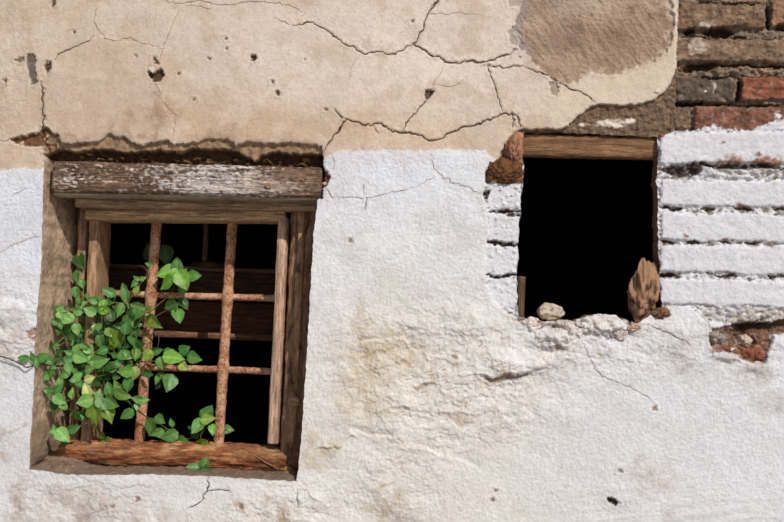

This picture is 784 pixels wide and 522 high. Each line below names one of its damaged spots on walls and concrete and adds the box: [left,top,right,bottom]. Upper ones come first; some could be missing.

crack [41,85,56,159]
flaking render [9,125,326,171]
crack [57,0,595,207]
spalling [504,131,524,161]
flaking render [510,0,784,139]
spalling [707,318,784,368]